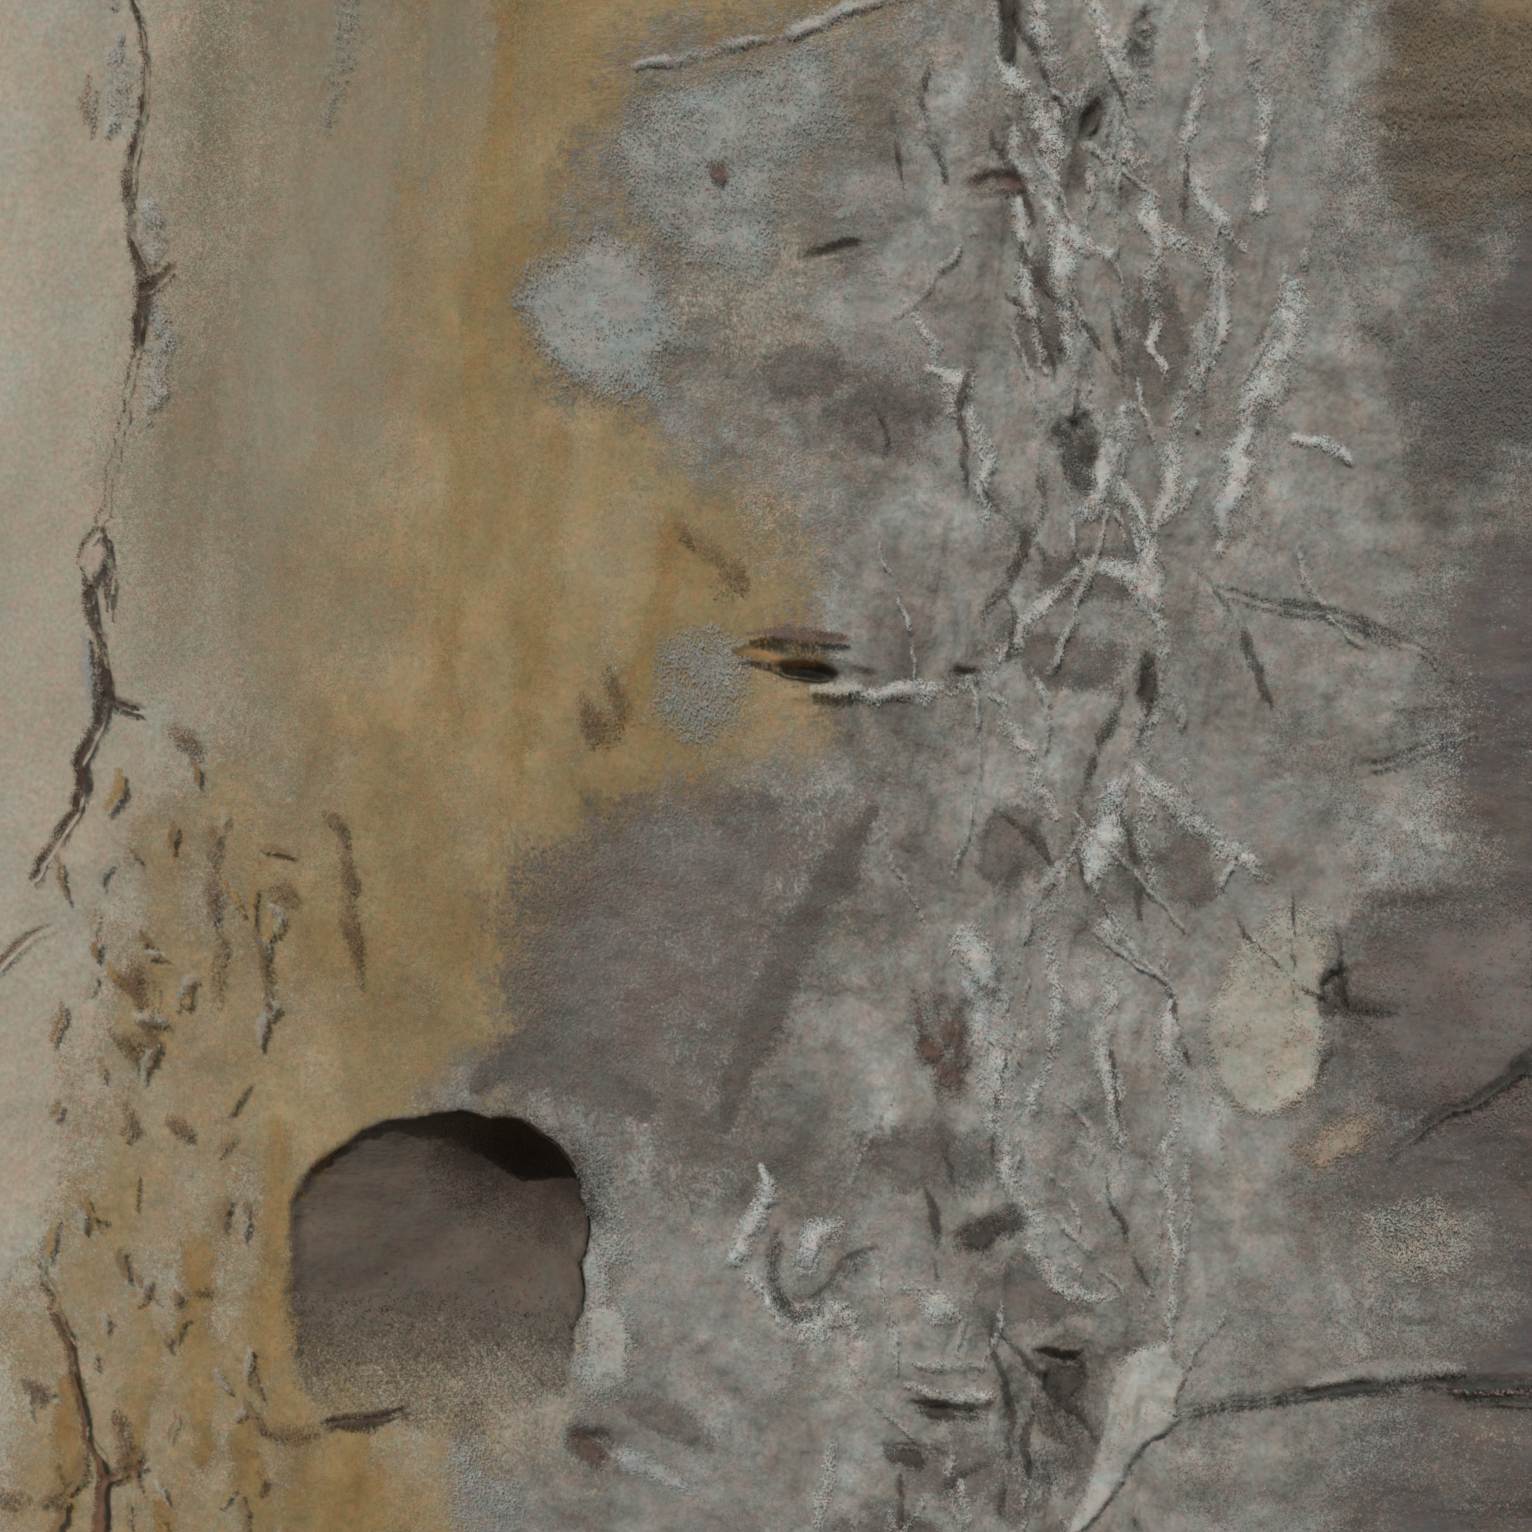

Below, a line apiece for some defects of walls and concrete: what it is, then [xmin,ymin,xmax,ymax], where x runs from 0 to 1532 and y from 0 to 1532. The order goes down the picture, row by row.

crack [36,1238,145,1532]
crack [28,0,172,882]
damp [64,0,1106,1532]
spalling [349,0,1532,1532]
damp [840,0,1532,1532]
crack [1172,1353,1532,1420]
crack [1386,1043,1532,1155]